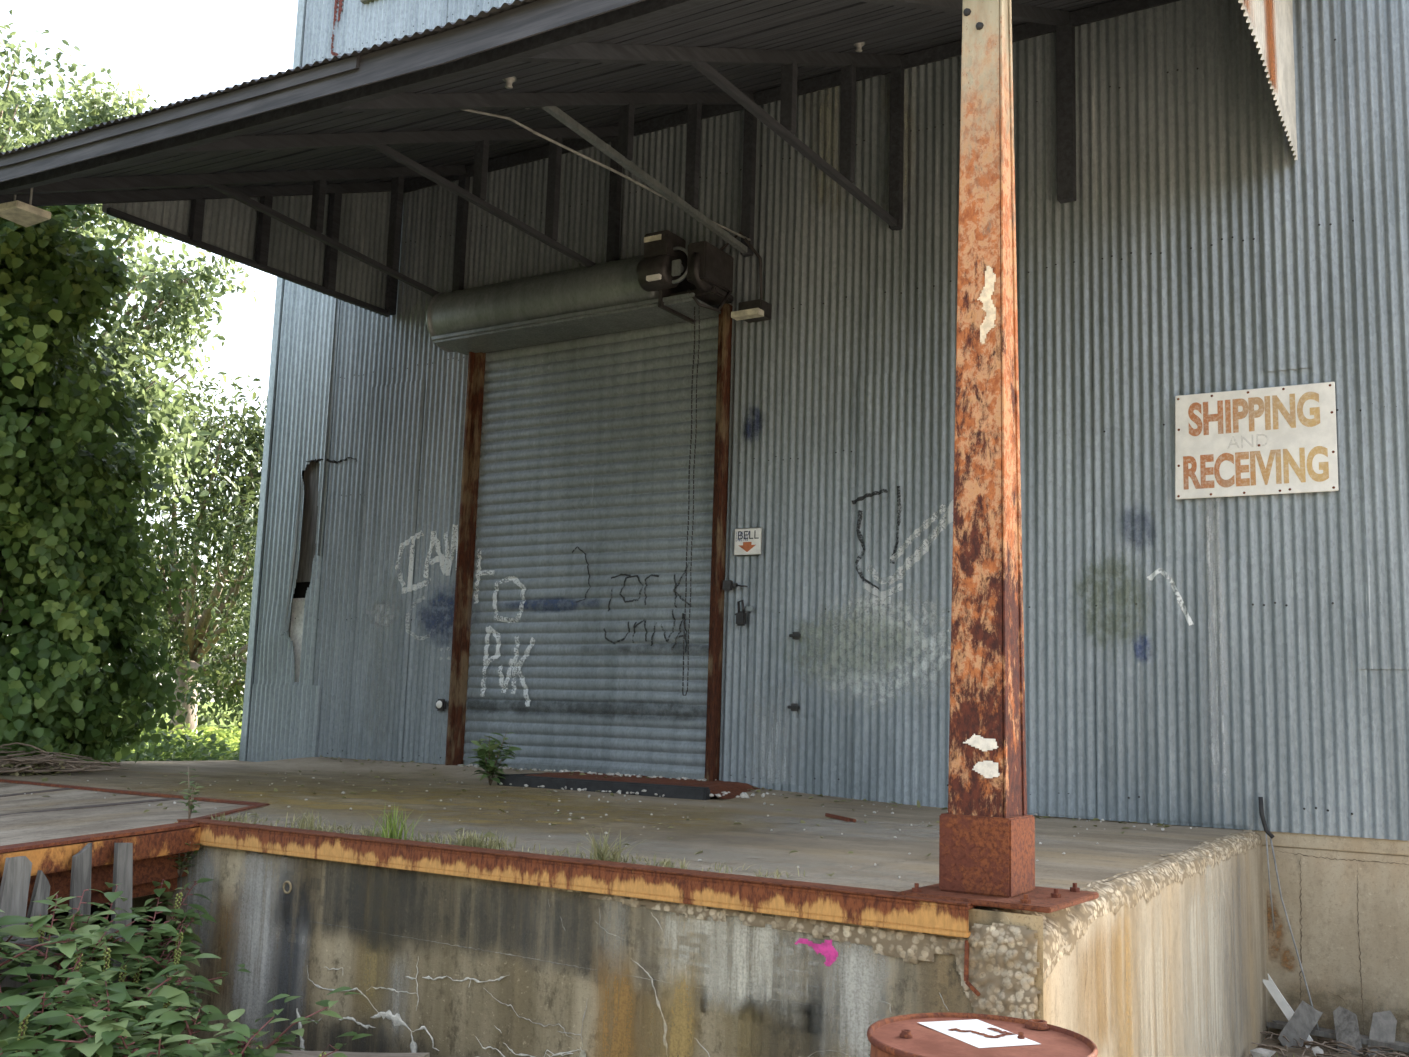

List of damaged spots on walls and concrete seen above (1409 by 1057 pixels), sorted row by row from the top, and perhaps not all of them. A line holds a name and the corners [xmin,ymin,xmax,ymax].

corrosion [331,0,343,56]
spalling [289,582,310,638]
leakage [233,851,422,1053]
crack [307,959,588,1057]
leakage [460,886,592,969]
crack [548,900,710,1057]
leakage [665,903,884,1057]
spalling [558,830,1262,1020]